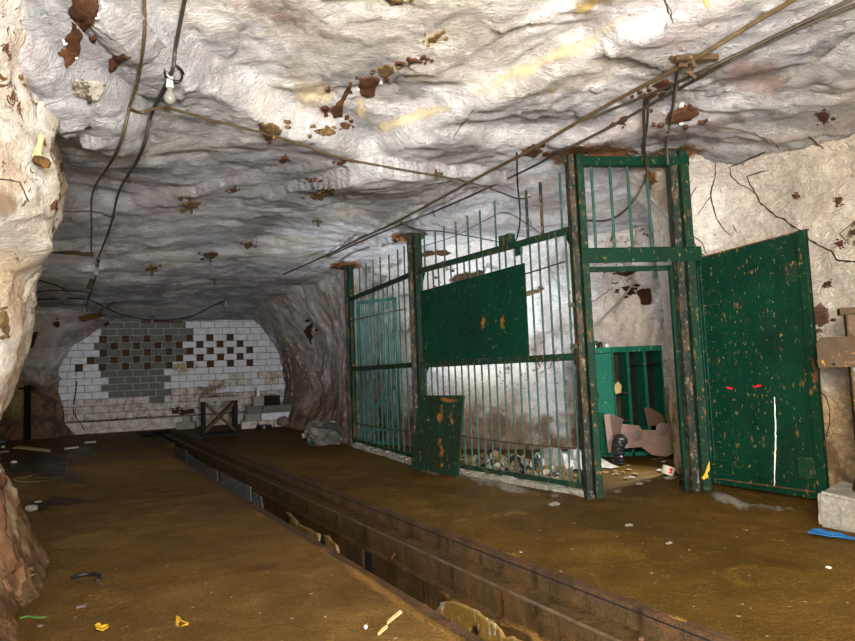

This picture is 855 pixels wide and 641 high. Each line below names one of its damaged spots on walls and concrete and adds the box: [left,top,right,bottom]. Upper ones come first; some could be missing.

peeling [58,0,100,69]
peeling [307,29,448,138]
peeling [178,196,202,213]
crack [691,127,855,263]